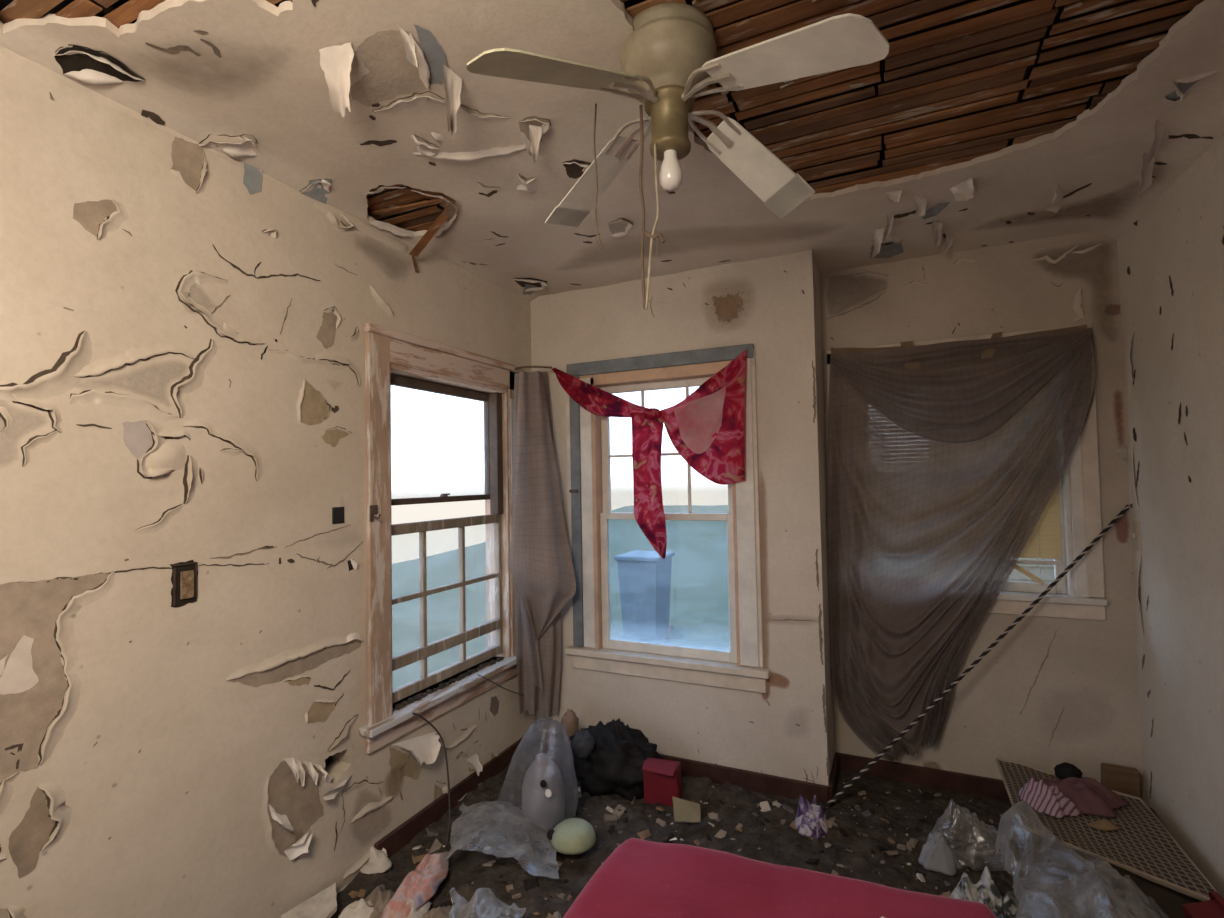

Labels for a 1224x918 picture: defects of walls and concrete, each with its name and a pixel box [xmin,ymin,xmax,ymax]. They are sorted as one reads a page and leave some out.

flaking render [54,44,146,85]
peeling [319,25,551,194]
crack [211,244,356,334]
damp [713,292,743,322]
crack [76,422,112,430]
peeling [0,270,363,534]
crack [17,525,363,583]
peeling [0,571,116,816]
peeling [226,633,363,687]
peeling [0,782,72,879]
peeling [260,714,393,861]
peeling [389,725,498,801]